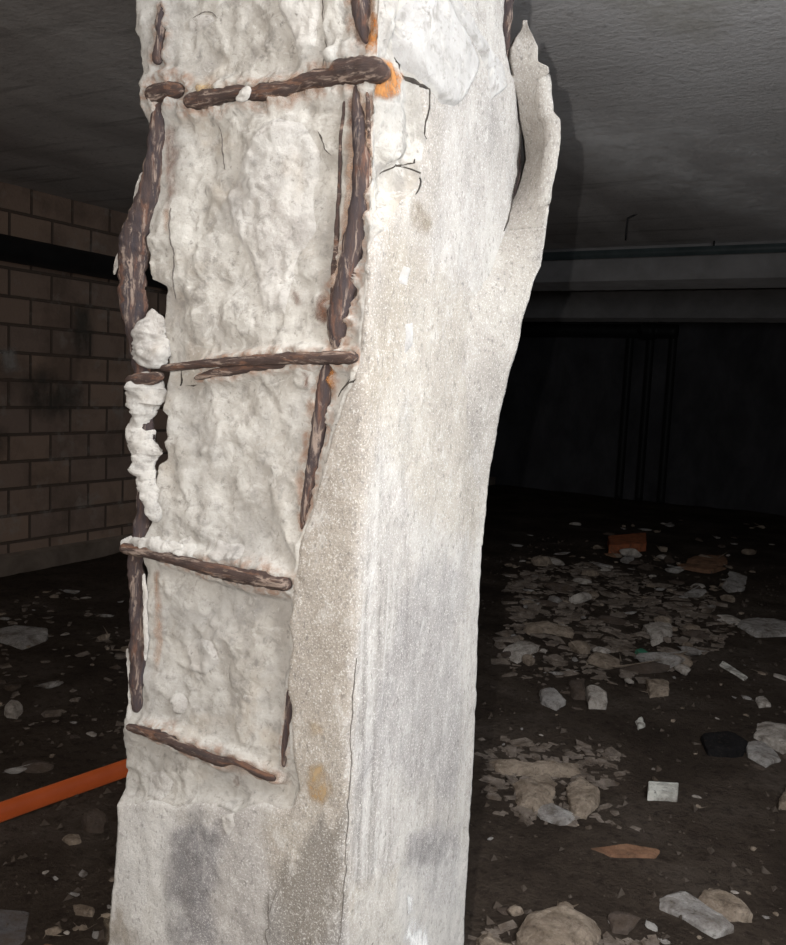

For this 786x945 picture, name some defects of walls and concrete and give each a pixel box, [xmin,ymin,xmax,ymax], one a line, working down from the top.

rust [349,0,401,126]
crack [394,57,431,139]
crack [380,159,422,195]
rust [316,298,327,321]
spalling [113,0,514,836]
crack [265,890,278,945]